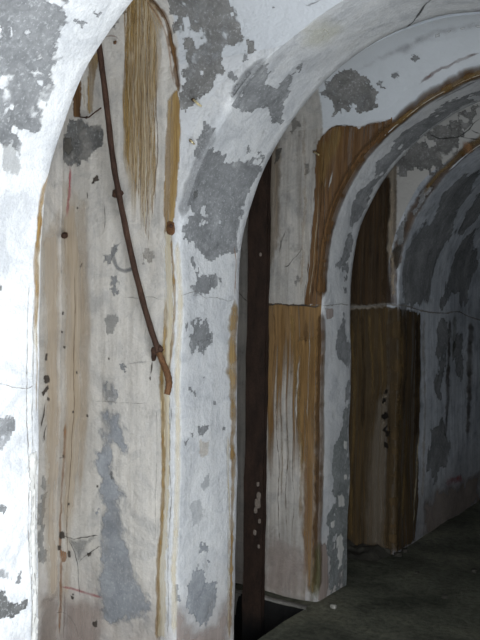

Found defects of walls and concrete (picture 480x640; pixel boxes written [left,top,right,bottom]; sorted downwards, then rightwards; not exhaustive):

peeling [0,0,87,156]
peeling [321,69,386,117]
corrosion [123,0,180,524]
peeling [180,121,265,262]
peeling [335,312,351,367]
corrosion [267,68,480,593]
peeling [392,170,480,400]
peeling [326,380,351,594]
peeling [426,418,451,485]
corrosion [157,534,168,619]